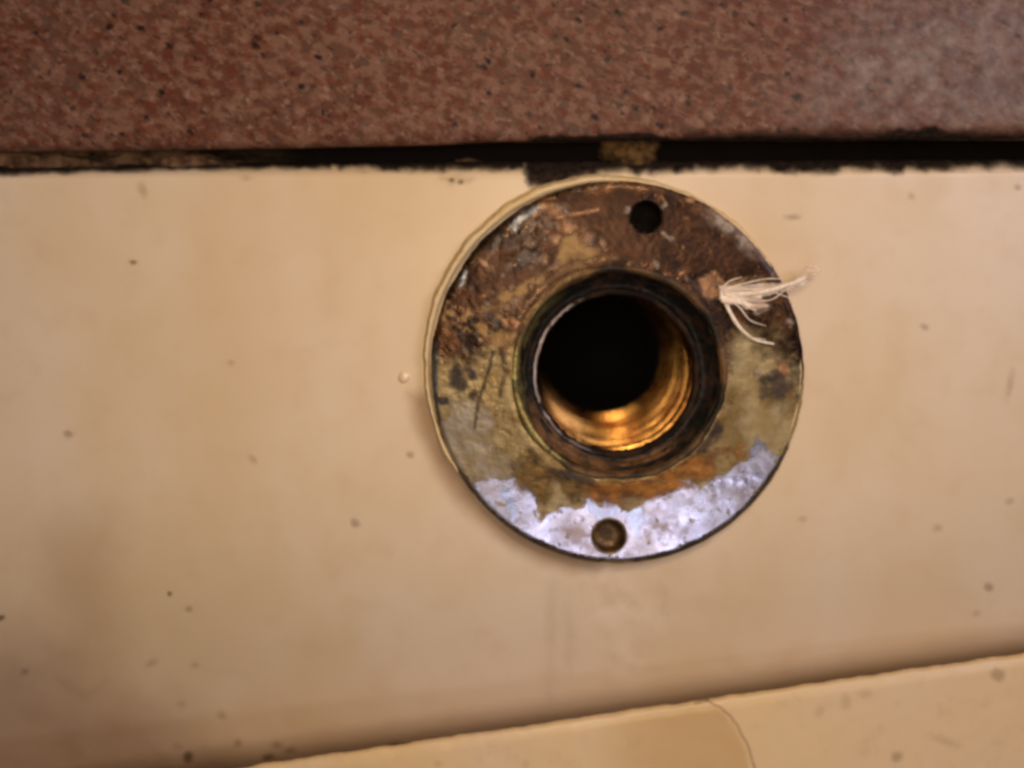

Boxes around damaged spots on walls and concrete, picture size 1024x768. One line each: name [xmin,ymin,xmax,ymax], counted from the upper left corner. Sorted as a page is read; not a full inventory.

corrosion [777,279,803,360]
corrosion [458,470,604,562]
corrosion [513,407,744,505]
corrosion [631,447,787,562]